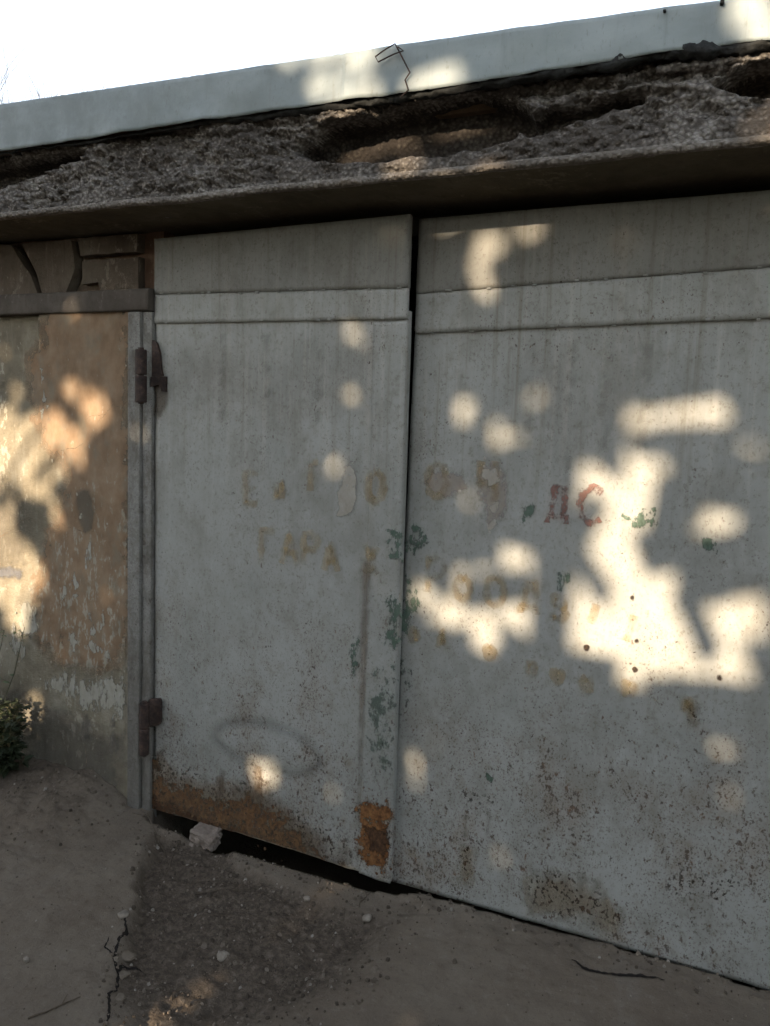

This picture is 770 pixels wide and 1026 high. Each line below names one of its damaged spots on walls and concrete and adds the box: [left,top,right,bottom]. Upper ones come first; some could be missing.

spalling [722,74,770,99]
spalling [304,98,642,164]
spalling [0,156,81,189]
peeling [6,311,132,721]
rust [152,755,395,878]